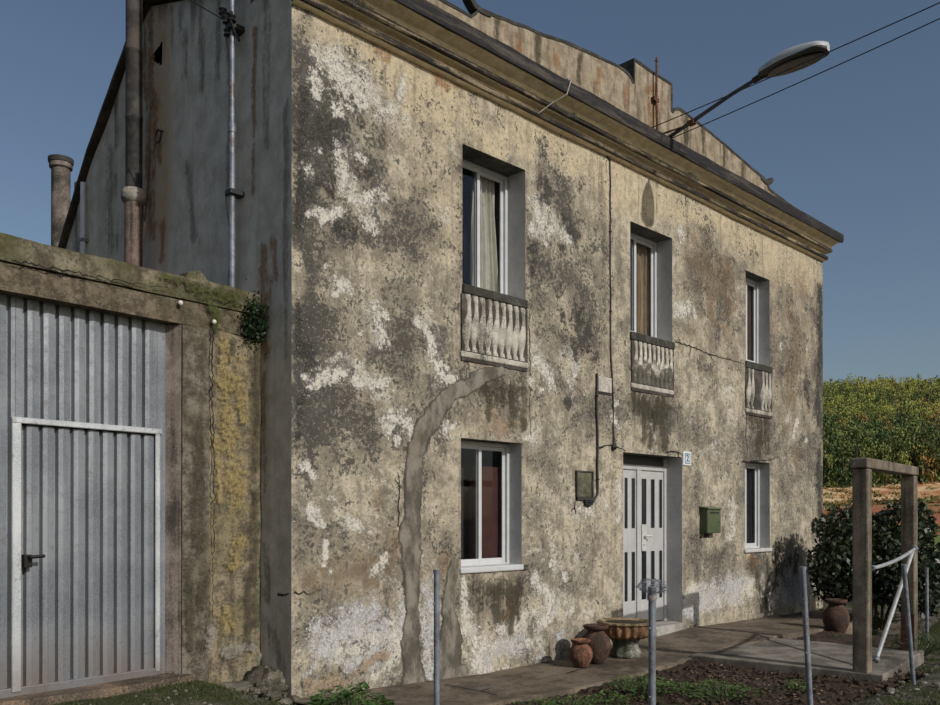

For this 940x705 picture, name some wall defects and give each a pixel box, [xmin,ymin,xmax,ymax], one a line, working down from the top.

peeling [307,49,408,122]
damp [293,86,366,231]
peeling [305,138,388,236]
damp [334,221,359,240]
rust [260,238,277,451]
damp [294,302,320,373]
peeling [323,263,354,298]
peeling [300,365,392,393]
peeling [370,299,392,349]
crack [210,325,218,623]
crack [394,366,505,685]
damp [470,578,565,675]